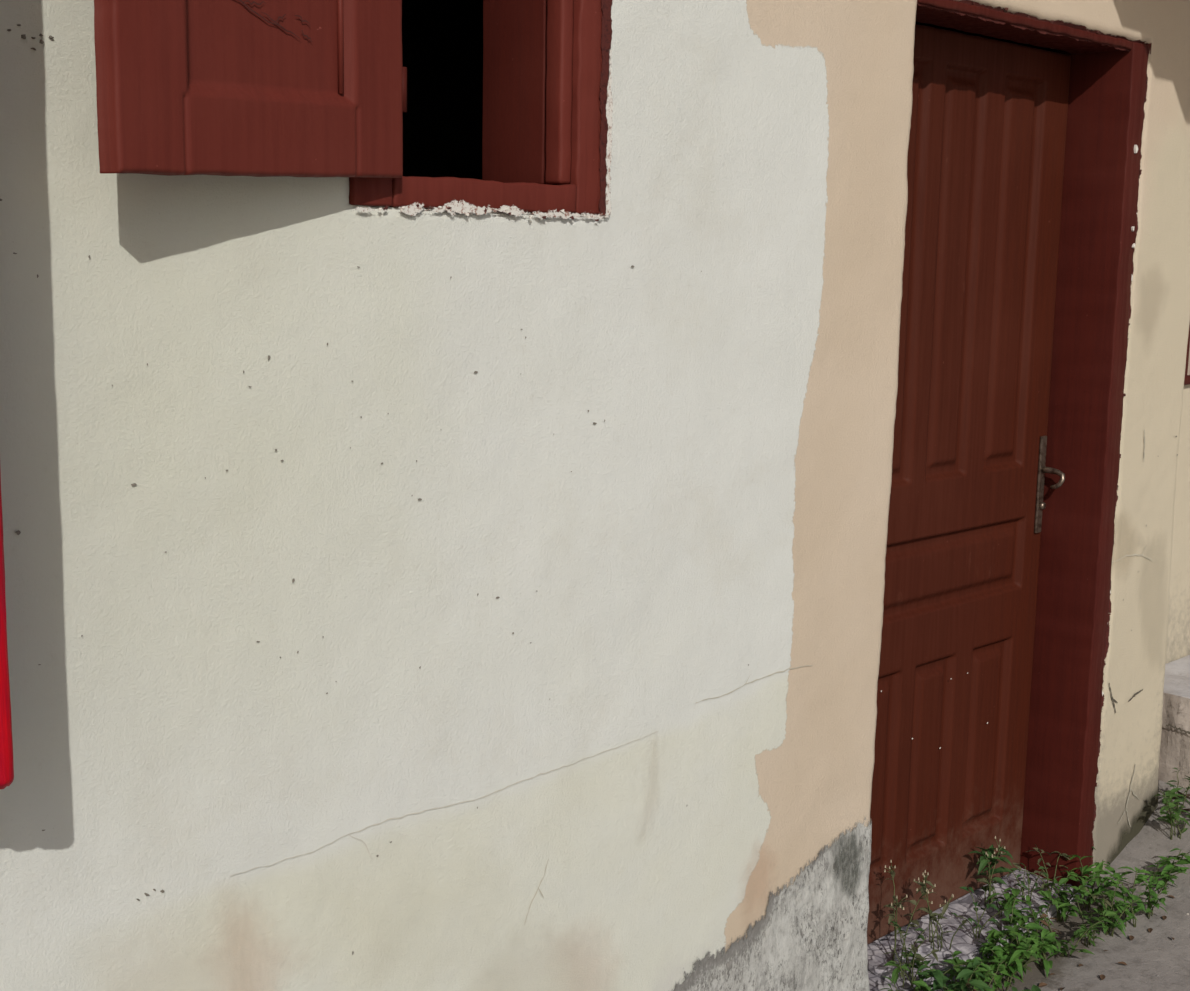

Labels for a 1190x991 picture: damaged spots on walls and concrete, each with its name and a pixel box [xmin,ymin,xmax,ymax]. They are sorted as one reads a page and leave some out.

peeling [353,0,613,221]
crack [696,665,813,703]
crack [230,731,658,877]
spalling [674,816,872,991]